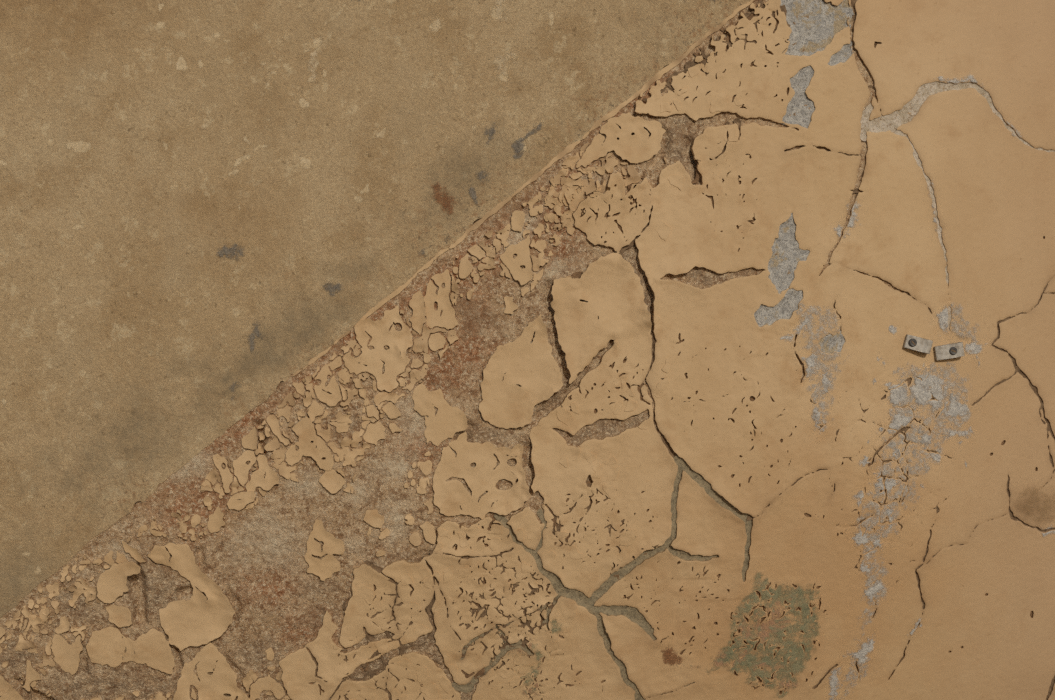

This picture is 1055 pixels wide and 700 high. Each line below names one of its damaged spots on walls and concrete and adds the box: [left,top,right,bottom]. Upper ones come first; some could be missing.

crack [643,0,790,105]
spalling [780,0,854,129]
crack [619,194,652,255]
crack [712,118,741,160]
spalling [754,213,810,327]
crack [784,0,1055,331]
flaking render [0,0,751,700]
crack [971,285,1055,478]
crack [303,334,1055,700]
mould [711,574,819,698]